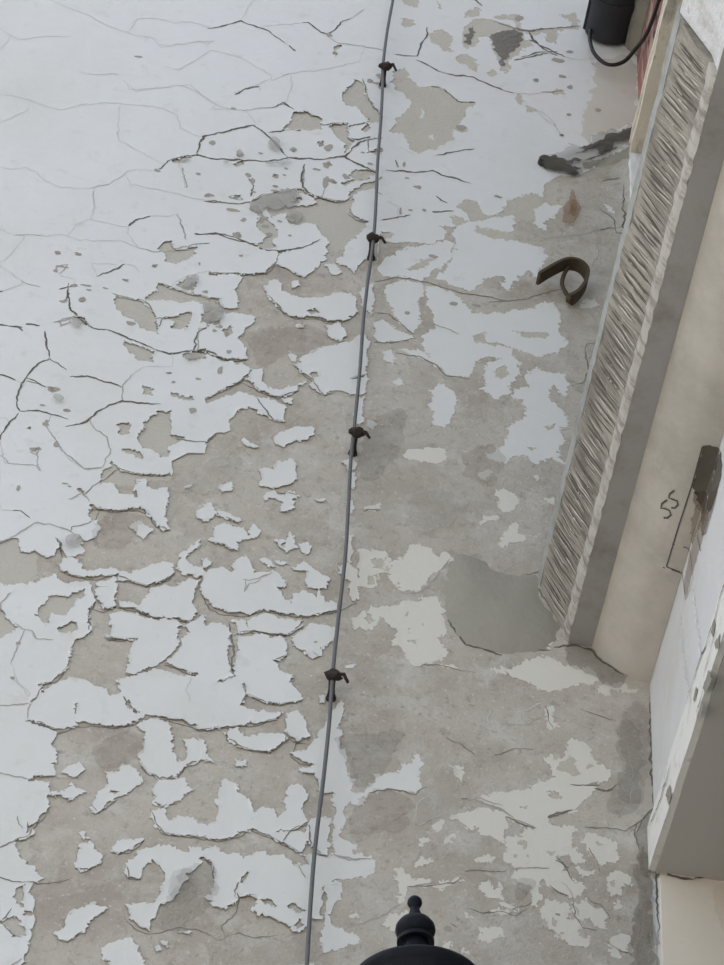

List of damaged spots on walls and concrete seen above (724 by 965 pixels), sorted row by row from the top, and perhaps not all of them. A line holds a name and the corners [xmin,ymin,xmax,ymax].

peeling [284,113,354,153]
peeling [342,69,475,154]
spalling [580,127,632,154]
crack [0,0,560,671]
peeling [0,182,375,965]
peeling [309,155,724,965]
crack [0,592,311,766]
crack [537,644,624,675]
crack [141,761,197,780]
crack [461,697,669,871]
crack [0,802,370,884]
crack [651,872,704,965]